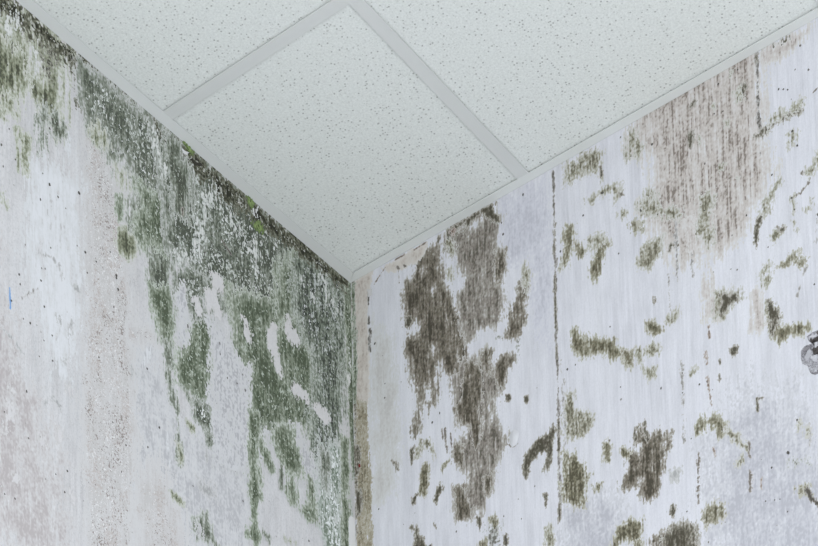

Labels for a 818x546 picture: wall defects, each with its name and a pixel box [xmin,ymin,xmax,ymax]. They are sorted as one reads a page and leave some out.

damp [754,20,816,69]
damp [0,0,358,389]
damp [621,124,647,165]
damp [753,175,785,250]
mould [753,93,807,153]
damp [769,192,815,246]
mould [801,149,818,180]
damp [0,131,91,546]
damp [308,145,721,546]
spalling [801,330,818,375]
damp [116,314,261,546]
damp [521,247,818,546]